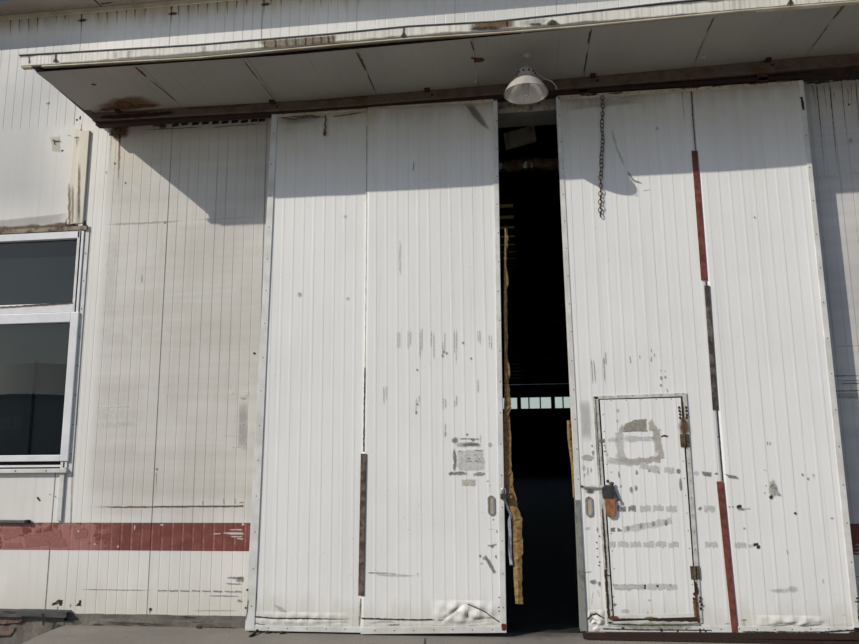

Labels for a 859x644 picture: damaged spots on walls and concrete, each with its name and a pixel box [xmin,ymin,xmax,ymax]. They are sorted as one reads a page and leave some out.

rust [100,97,172,159]
peeling [449,434,492,476]
peeling [599,419,680,474]
peeling [611,505,679,548]